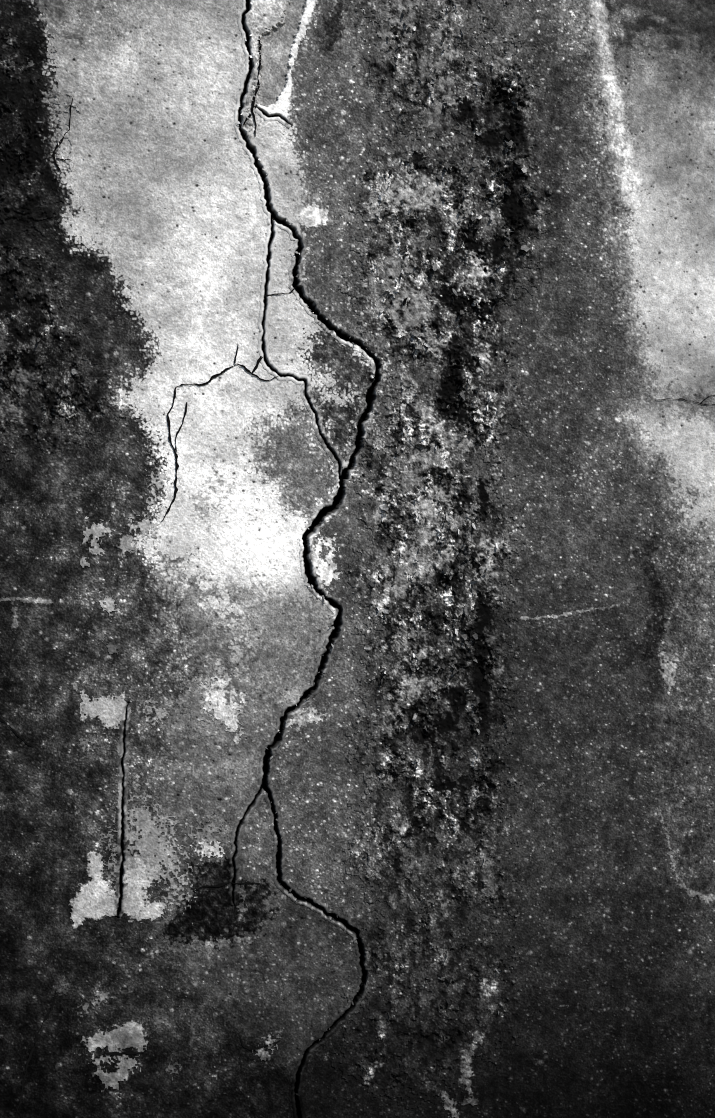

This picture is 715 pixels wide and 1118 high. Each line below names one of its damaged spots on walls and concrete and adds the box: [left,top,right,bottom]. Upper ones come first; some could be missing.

water stain [0,0,444,1118]
crack [160,0,384,1118]
water stain [301,0,715,1118]
crack [114,703,132,917]
peeling [68,787,232,928]
peeling [77,989,113,1017]
peeling [78,1002,168,1098]
peeling [165,1056,181,1081]